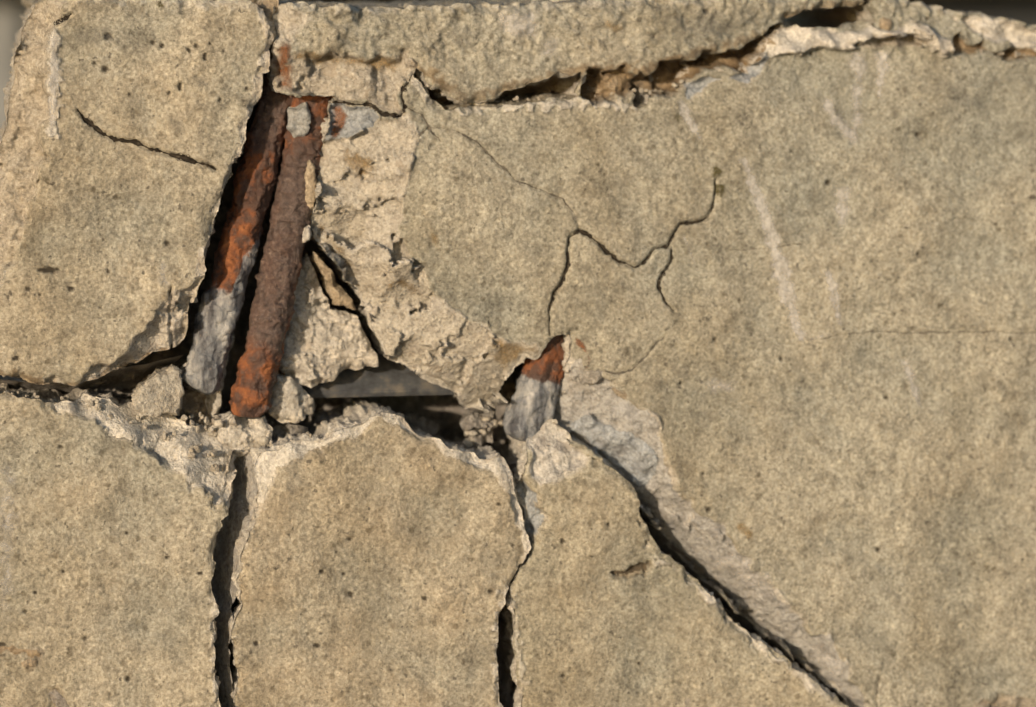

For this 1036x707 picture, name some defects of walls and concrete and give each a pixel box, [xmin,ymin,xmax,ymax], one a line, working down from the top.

crack [497,40,777,99]
crack [78,111,216,170]
spalling [272,51,540,404]
crack [330,75,716,322]
crack [0,344,190,403]
spalling [84,283,194,377]
crack [603,337,664,375]
crack [211,449,259,707]
crack [639,503,795,663]
crack [496,608,514,707]